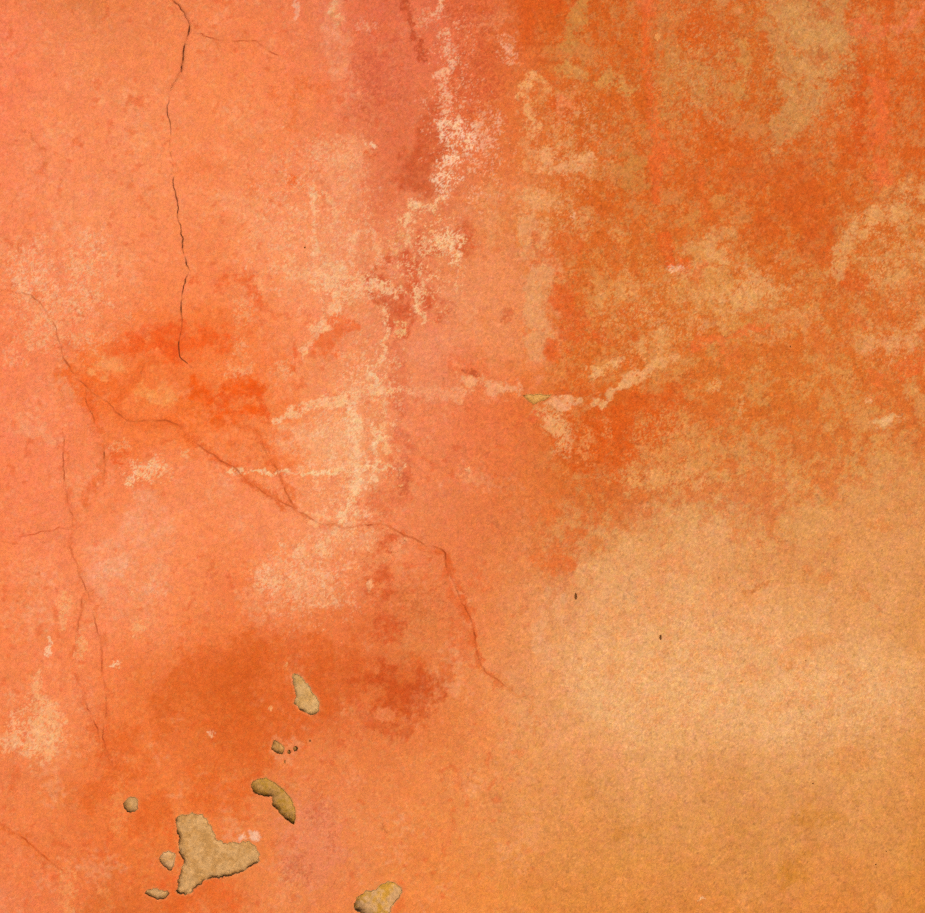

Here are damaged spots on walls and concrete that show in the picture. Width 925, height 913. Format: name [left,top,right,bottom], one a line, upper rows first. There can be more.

crack [166,0,285,369]
crack [0,285,516,692]
damp [0,0,581,913]
crack [0,426,119,769]
damp [509,391,925,785]
spalling [289,670,323,718]
spalling [269,737,301,766]
spalling [120,794,141,816]
spalling [248,774,299,827]
spalling [142,809,263,903]
spalling [351,878,405,913]